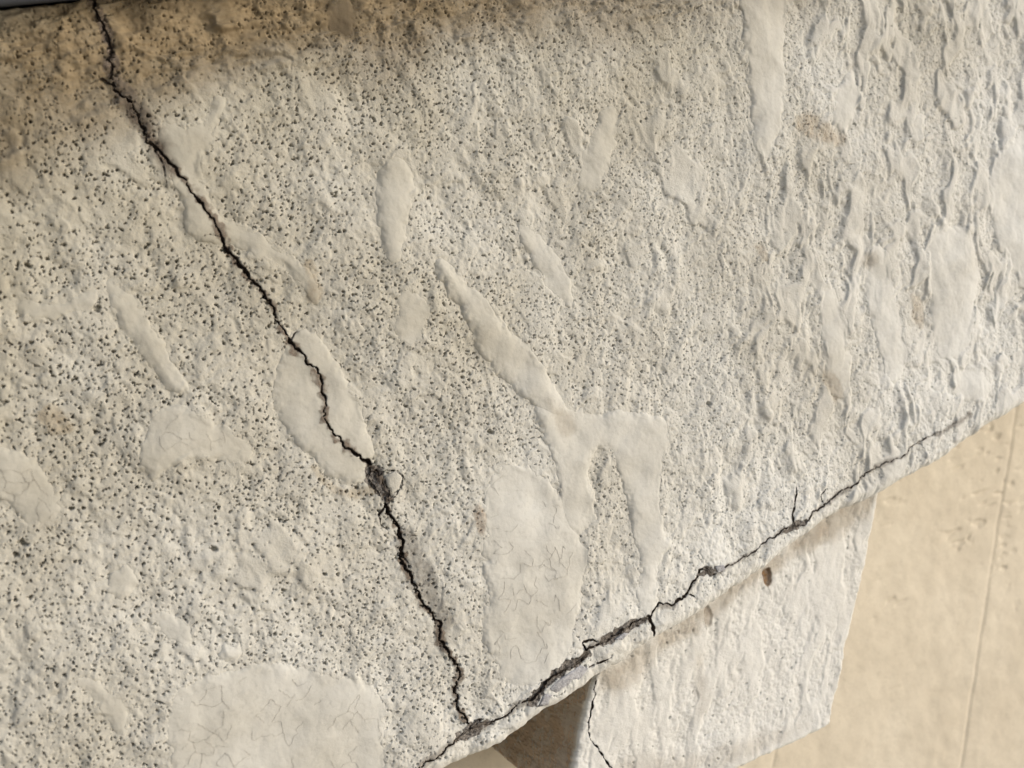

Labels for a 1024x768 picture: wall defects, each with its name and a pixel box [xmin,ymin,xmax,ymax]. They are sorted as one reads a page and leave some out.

crack [91,0,717,768]
crack [725,415,969,568]